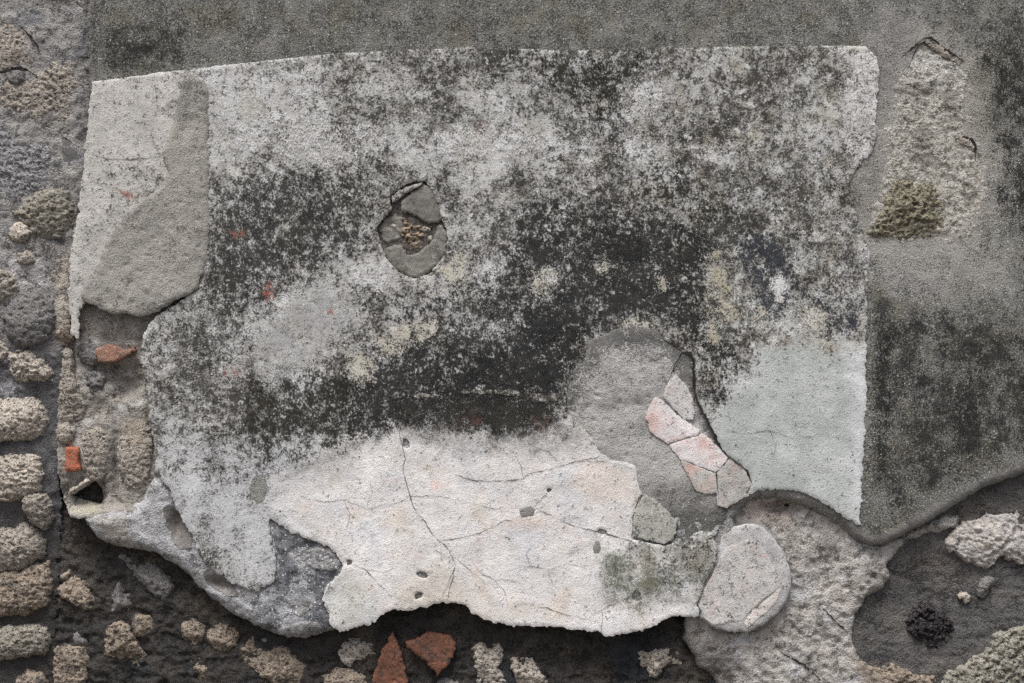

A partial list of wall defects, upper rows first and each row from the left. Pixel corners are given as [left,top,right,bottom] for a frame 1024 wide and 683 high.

crack [902,37,966,62]
spalling [377,181,448,279]
leakage [201,109,1024,512]
spalling [163,506,193,549]
spalling [203,571,238,596]
spalling [247,519,343,637]
crack [302,432,653,631]
crack [697,546,719,614]